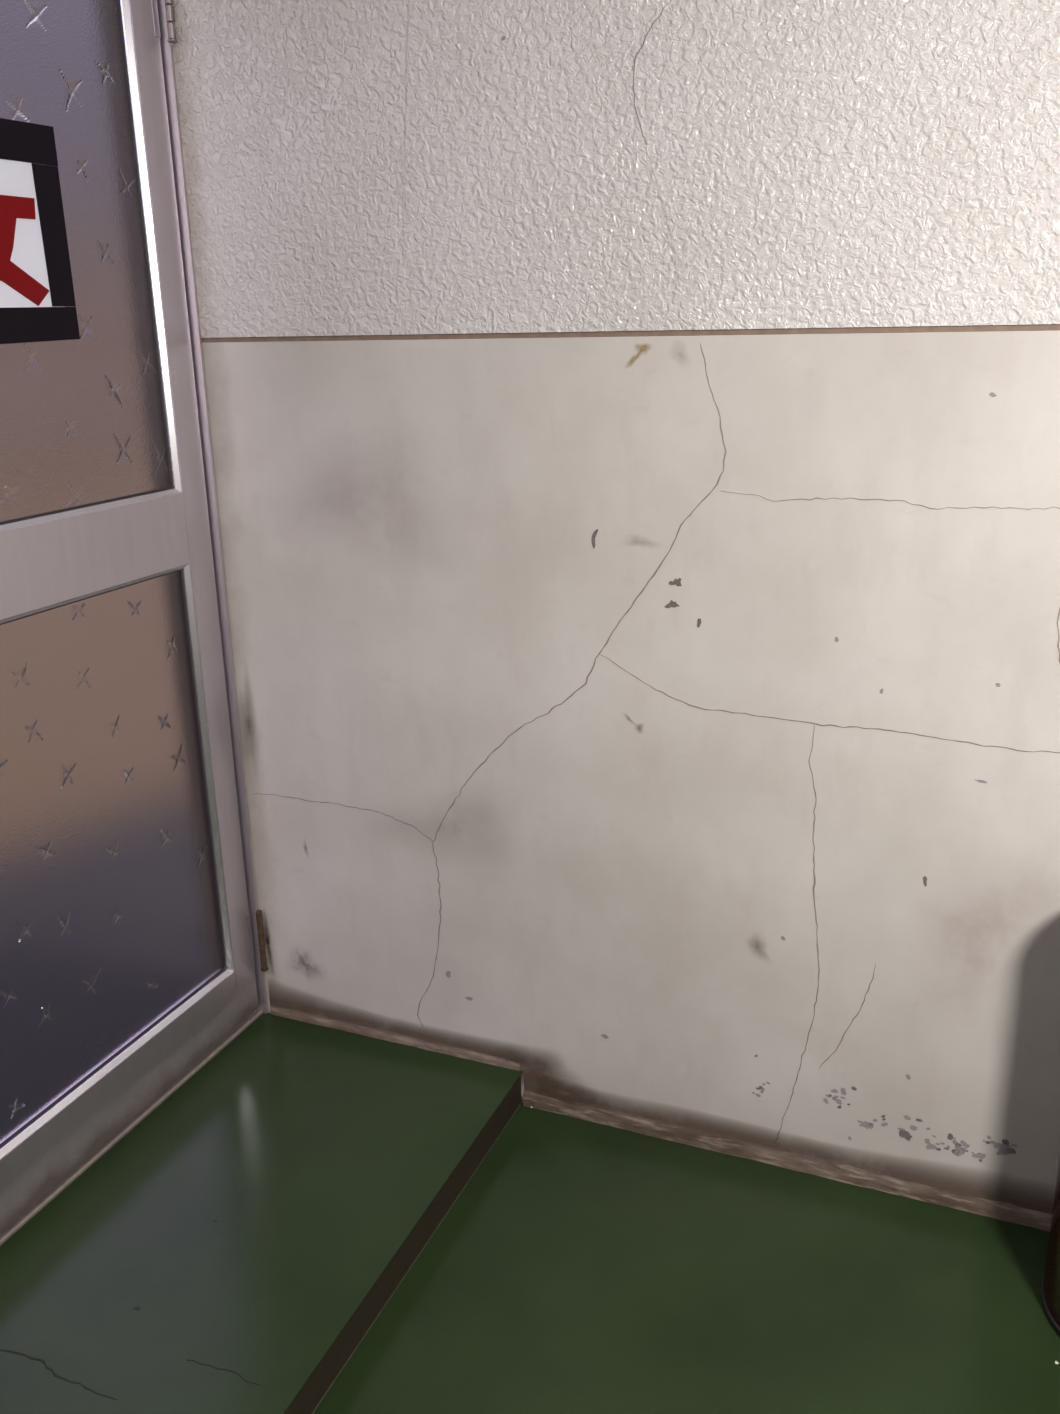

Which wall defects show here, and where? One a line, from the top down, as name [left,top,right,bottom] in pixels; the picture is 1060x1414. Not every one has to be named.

crack [252,343,1060,1138]
damp [269,991,528,1063]
peeling [823,1087,857,1109]
damp [524,1080,1054,1214]
peeling [848,1115,1017,1162]
crack [0,1349,116,1400]